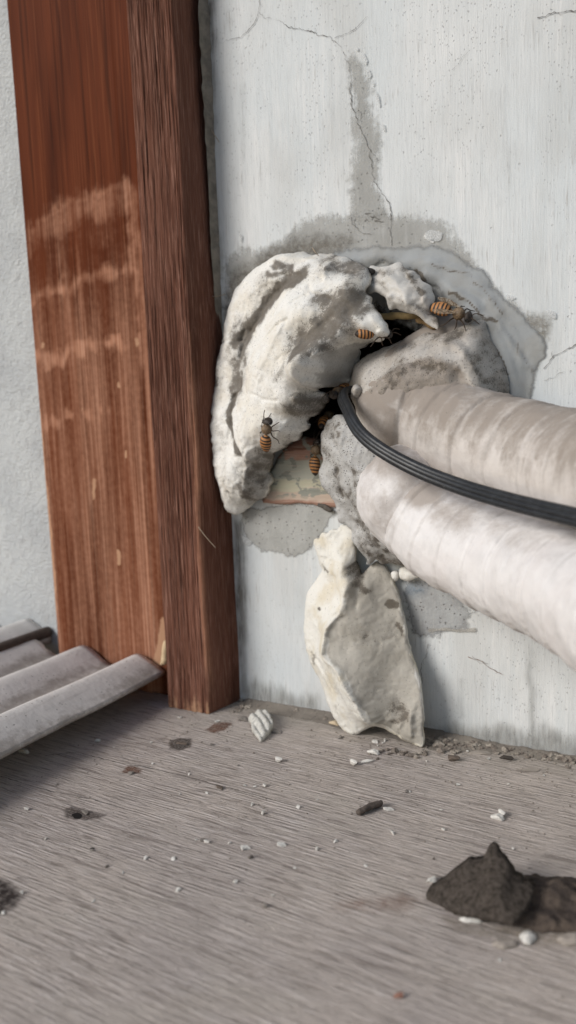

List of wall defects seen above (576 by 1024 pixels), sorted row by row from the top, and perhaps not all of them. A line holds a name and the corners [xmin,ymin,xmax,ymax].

crack [225,3,392,245]
peeling [226,47,476,291]
leakage [223,240,341,327]
peeling [366,292,416,323]
peeling [429,284,455,317]
peeling [242,503,335,557]
peeling [391,567,476,639]